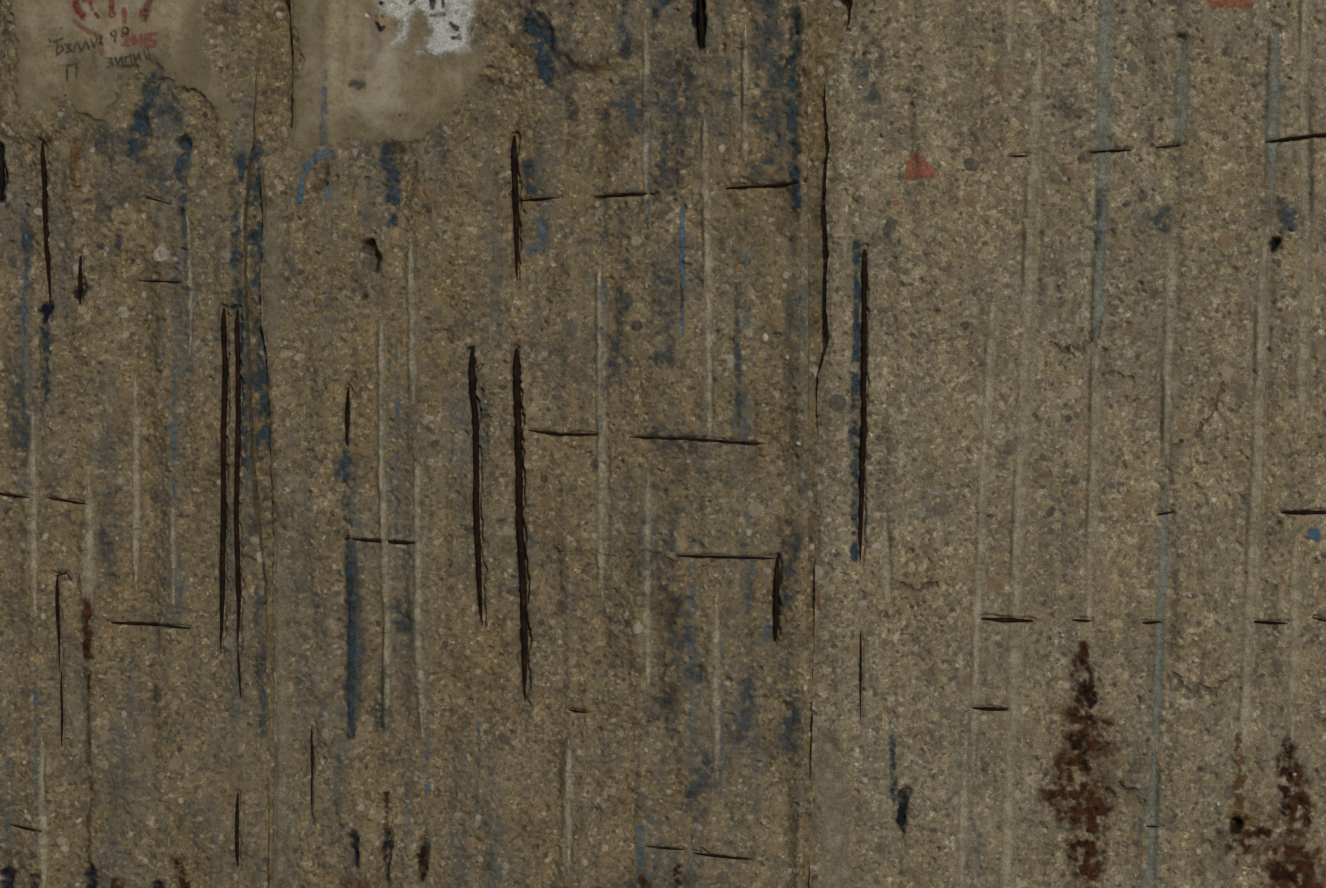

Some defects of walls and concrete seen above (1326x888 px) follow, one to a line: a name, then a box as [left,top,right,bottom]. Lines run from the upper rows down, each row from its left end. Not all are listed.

spalling [0,0,809,888]
corrosion [1040,641,1113,888]
corrosion [1228,737,1326,888]